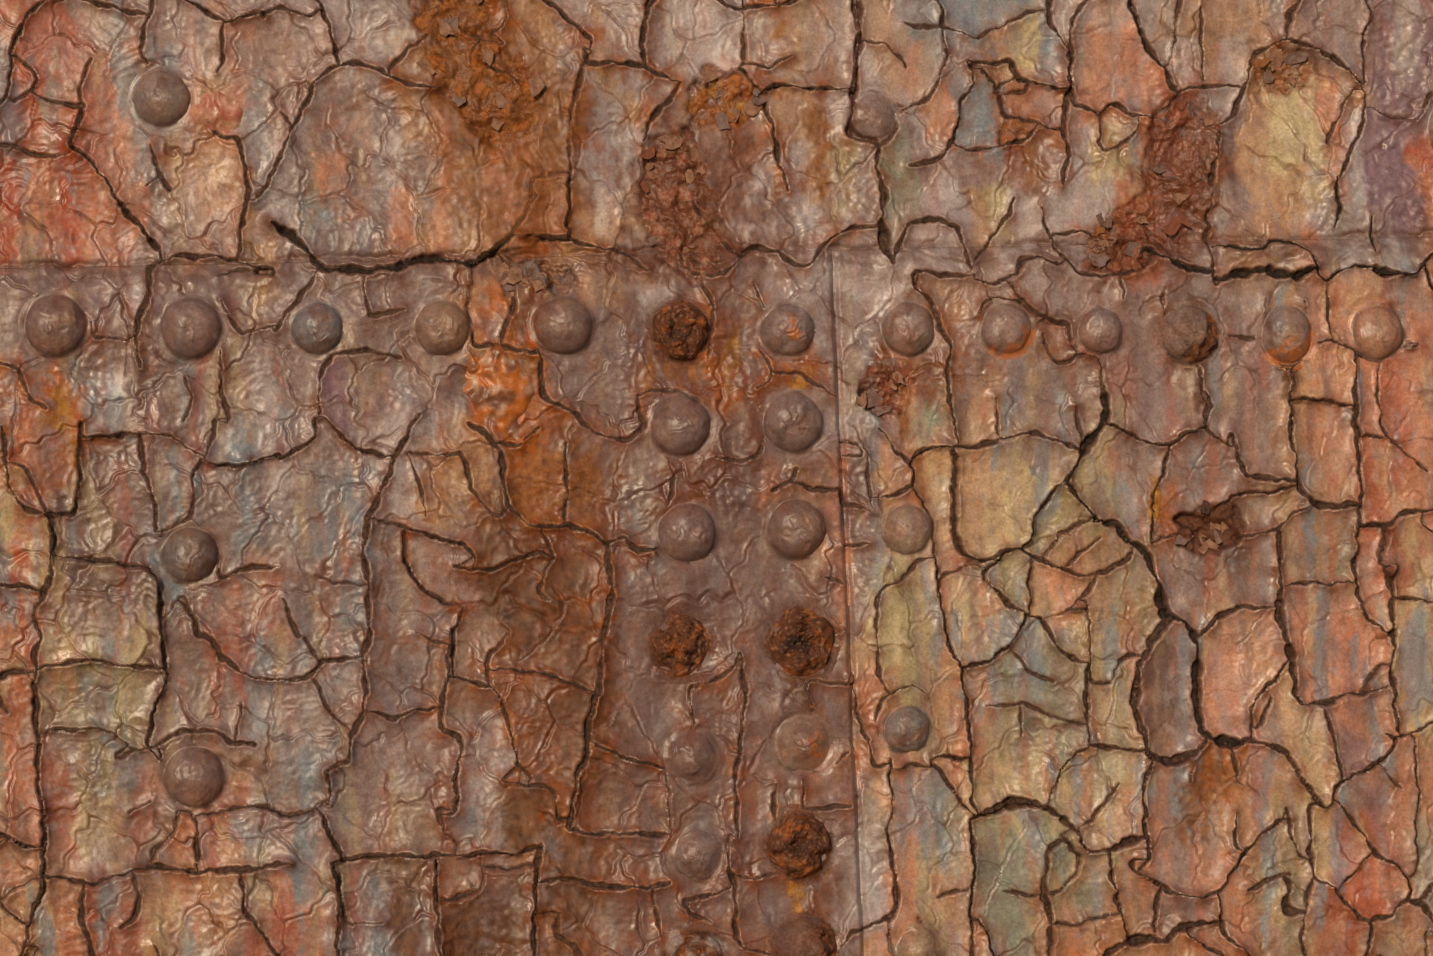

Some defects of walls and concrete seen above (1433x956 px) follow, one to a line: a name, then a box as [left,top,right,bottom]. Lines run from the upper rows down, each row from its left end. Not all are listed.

rust [411,0,573,173]
spalling [640,134,724,278]
rust [600,79,767,285]
spalling [691,65,770,130]
crack [0,0,777,956]
crack [671,0,1433,956]
spalling [1174,500,1243,555]